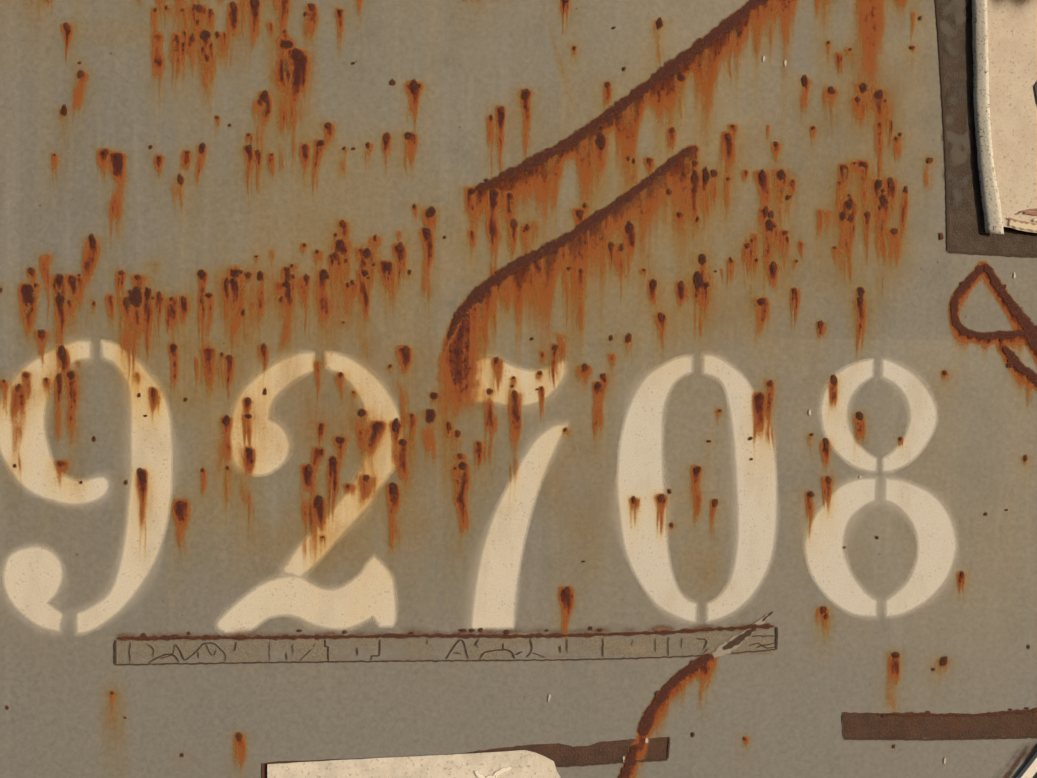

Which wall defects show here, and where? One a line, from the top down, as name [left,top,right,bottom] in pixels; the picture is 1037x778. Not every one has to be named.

corrosion [125,468,148,523]
corrosion [0,204,446,440]
corrosion [220,397,256,501]
corrosion [150,0,335,190]
corrosion [301,357,522,551]
spalling [448,147,693,339]
spalling [476,0,768,191]
corrosion [675,124,804,334]
corrosion [749,380,774,441]
corrosion [806,433,832,534]
corrosion [817,0,908,278]
peeling [935,0,1037,384]